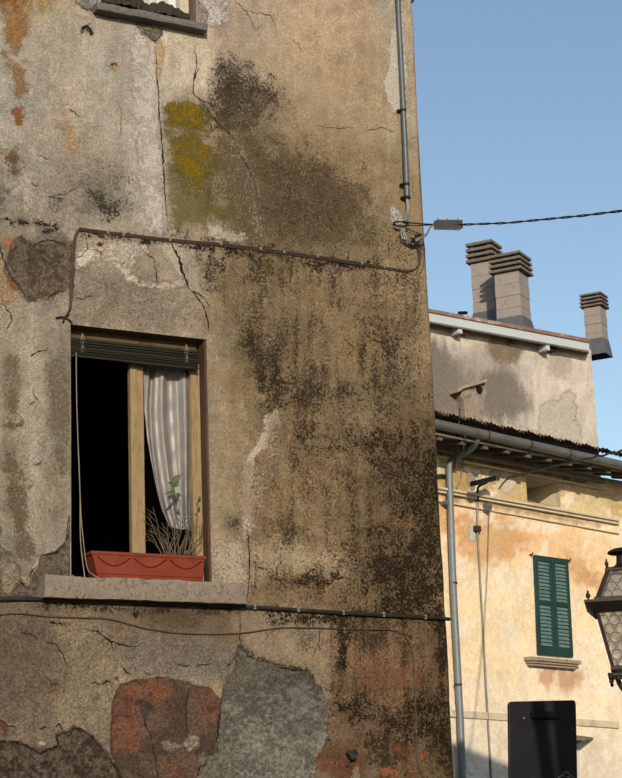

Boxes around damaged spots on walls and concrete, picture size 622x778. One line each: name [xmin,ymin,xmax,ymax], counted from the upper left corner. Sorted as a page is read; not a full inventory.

rust [0,0,54,126]
crack [138,22,167,215]
spalling [197,0,231,28]
crack [193,41,260,228]
leakage [2,354,20,415]
flaking render [0,234,186,305]
crack [169,237,210,332]
leakage [39,30,586,632]
leakage [0,451,35,580]
flaking render [0,677,222,778]